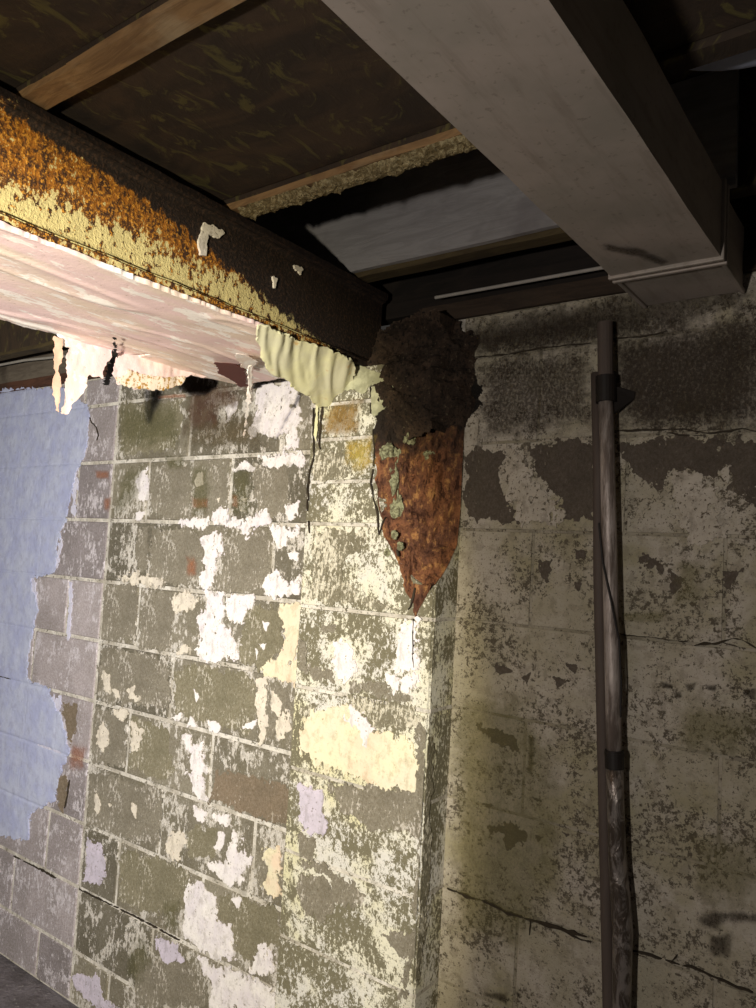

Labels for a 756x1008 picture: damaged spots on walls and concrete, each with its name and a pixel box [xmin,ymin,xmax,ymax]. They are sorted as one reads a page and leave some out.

leakage [474,293,756,433]
peeling [616,433,756,548]
peeling [0,220,593,1008]
crack [447,888,592,943]
crack [633,950,753,994]